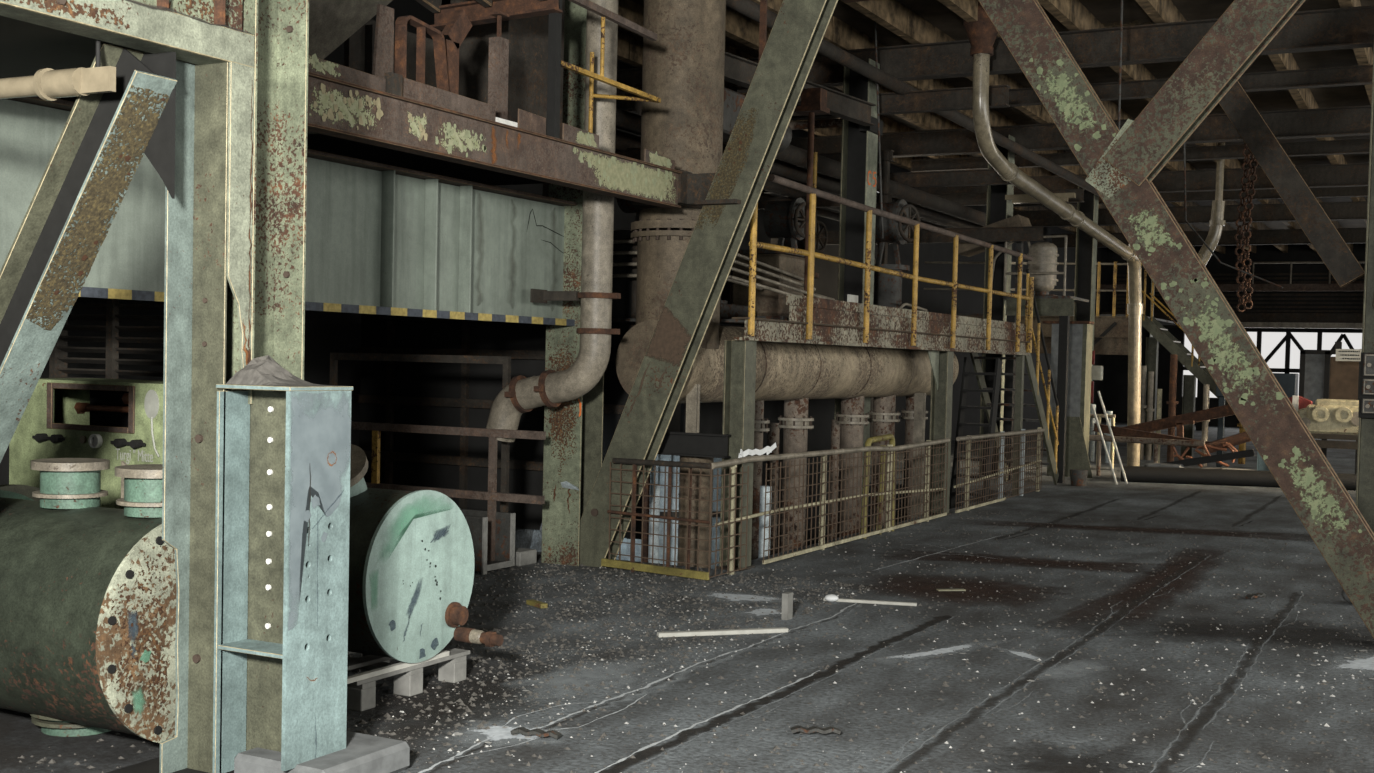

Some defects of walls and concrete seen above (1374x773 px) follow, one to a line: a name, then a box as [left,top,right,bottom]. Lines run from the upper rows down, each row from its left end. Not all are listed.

corrosion [4,0,130,29]
corrosion [26,85,169,331]
corrosion [169,0,227,22]
corrosion [243,87,253,365]
peeling [308,54,383,130]
peeling [408,111,487,158]
peeling [573,131,678,204]
corrosion [111,543,169,727]
crack [418,603,865,773]
crack [595,615,952,773]
crack [882,556,1206,773]
crack [1150,592,1302,773]